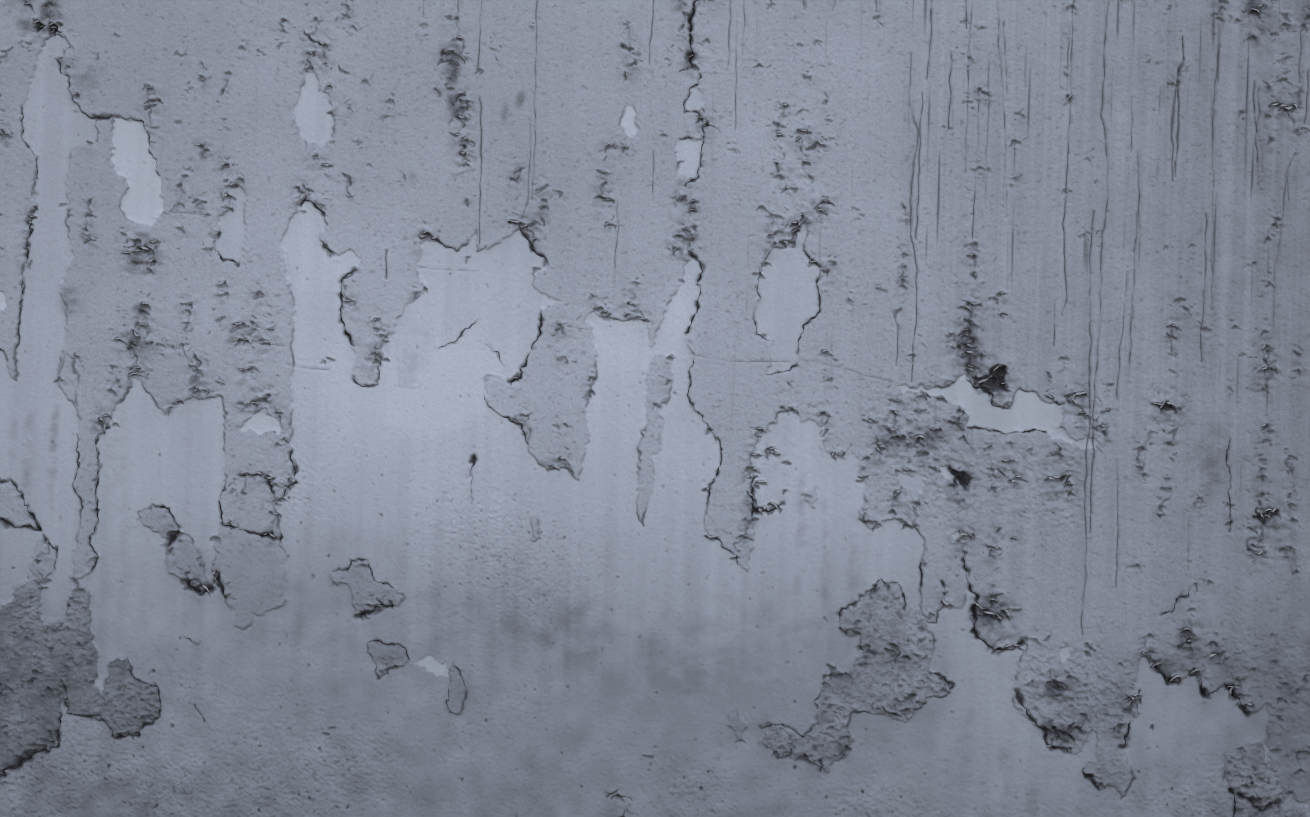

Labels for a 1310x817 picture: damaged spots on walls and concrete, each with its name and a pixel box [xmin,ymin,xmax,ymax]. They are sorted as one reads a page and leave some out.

peeling [111,78,250,282]
peeling [168,8,380,208]
peeling [429,6,503,177]
peeling [593,105,639,237]
peeling [618,15,647,87]
peeling [670,138,704,186]
peeling [659,0,719,77]
peeling [685,85,715,136]
peeling [768,91,840,202]
peeling [940,12,997,141]
peeling [0,0,162,776]
peeling [0,178,1310,817]